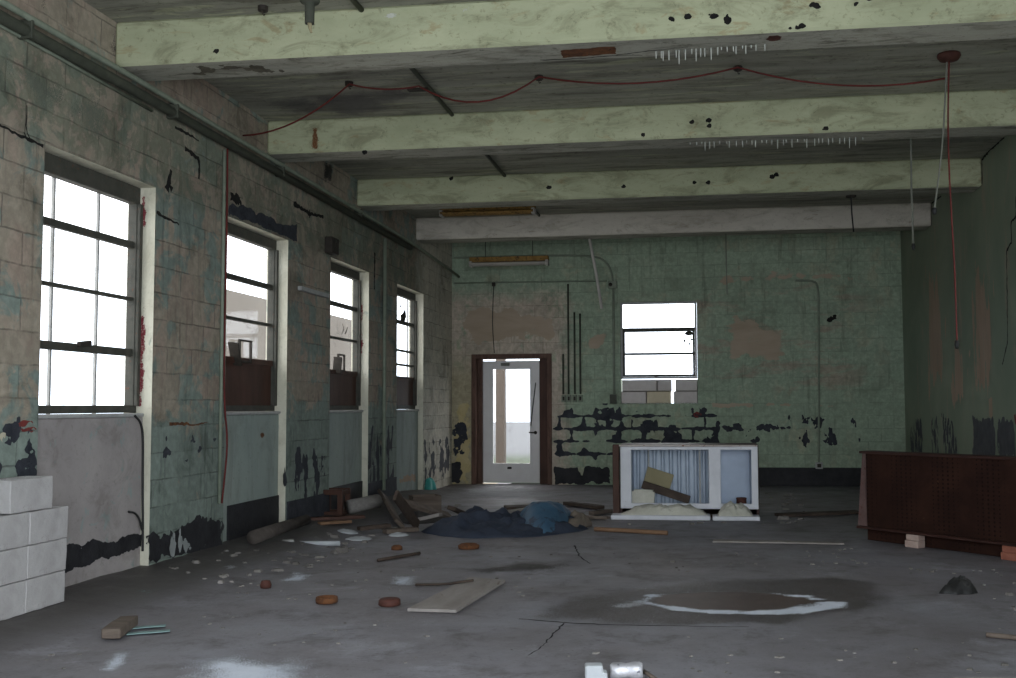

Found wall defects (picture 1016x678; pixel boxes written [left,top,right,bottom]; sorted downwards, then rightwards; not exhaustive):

crack [0,113,44,148]
crack [1002,199,1016,365]
peeling [0,416,37,477]
peeling [553,403,791,485]
peeling [799,415,837,447]
peeling [972,415,1015,456]
peeling [65,515,224,573]
water stain [527,576,901,626]
crack [527,619,614,655]